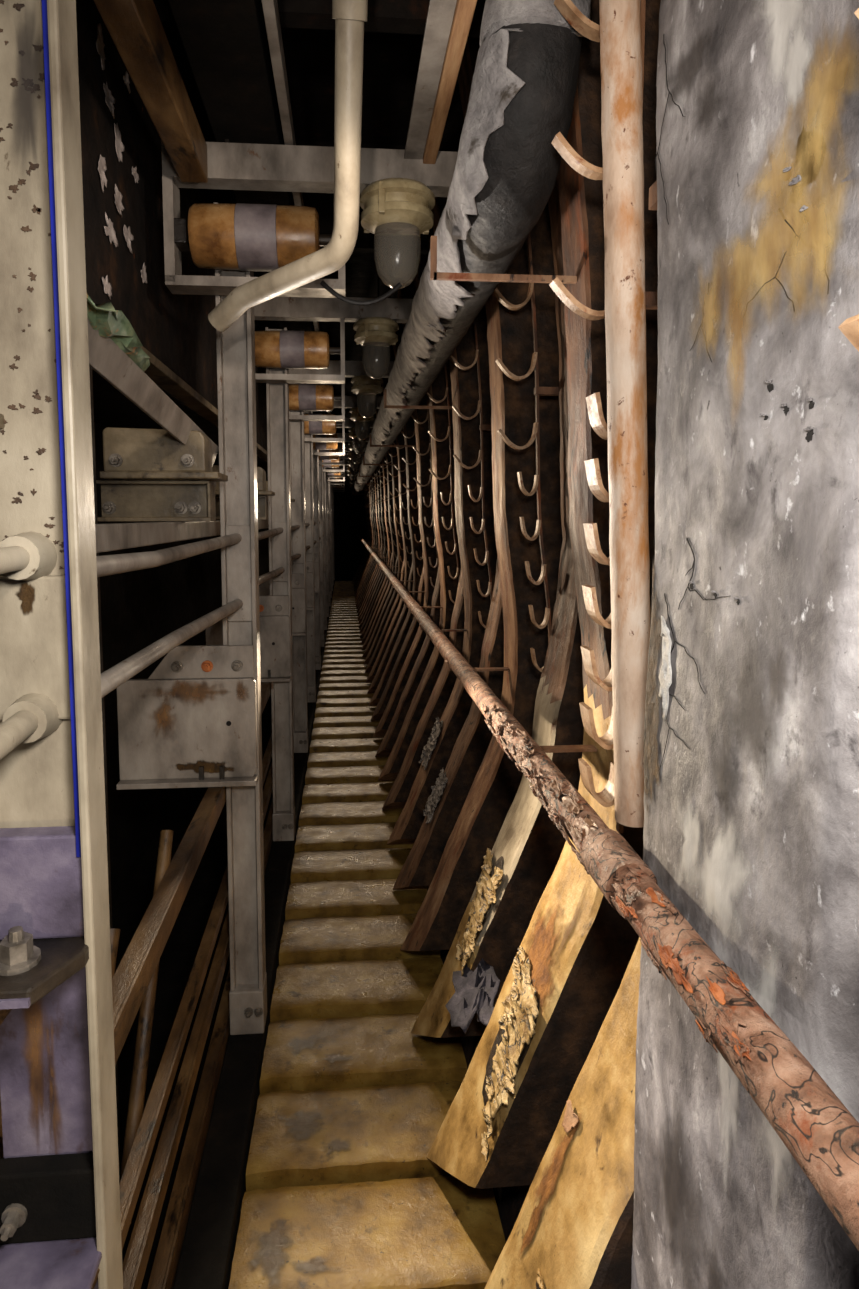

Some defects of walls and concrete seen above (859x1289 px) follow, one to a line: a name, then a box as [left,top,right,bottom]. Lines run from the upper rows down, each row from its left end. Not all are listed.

damp [766,0,852,164]
damp [703,145,829,386]
rust [155,683,246,729]
rust [176,760,234,773]
crack [659,537,728,770]
peeling [456,848,503,976]
rust [522,906,578,1006]
peeling [481,946,540,1162]
rust [520,1099,581,1254]